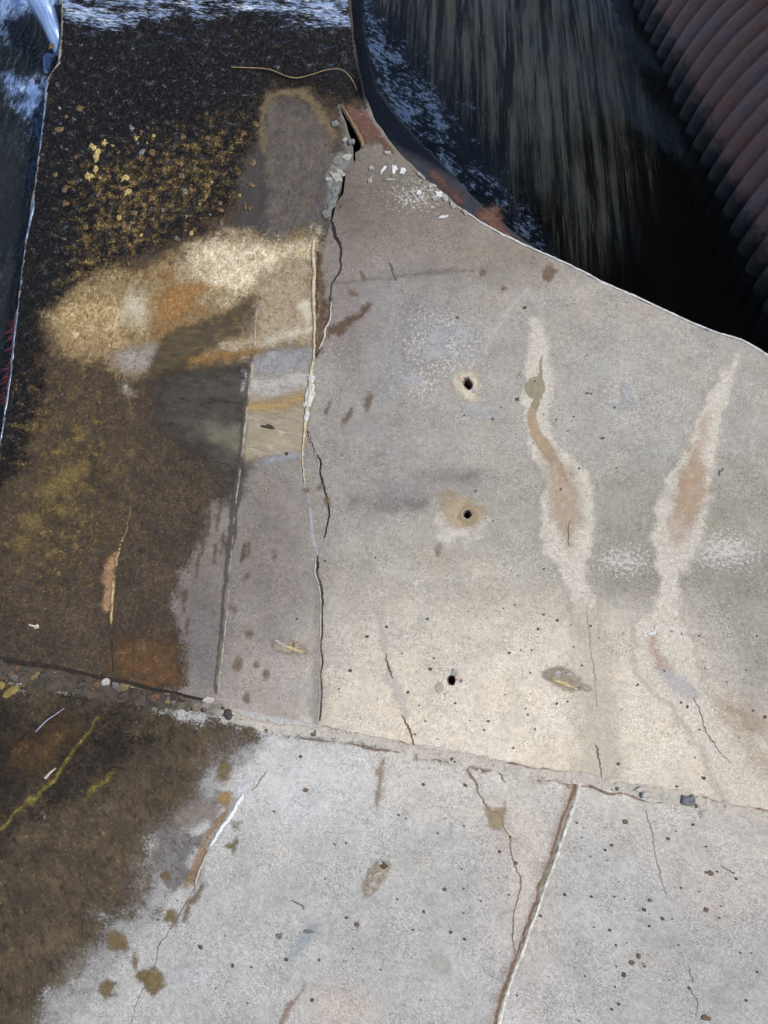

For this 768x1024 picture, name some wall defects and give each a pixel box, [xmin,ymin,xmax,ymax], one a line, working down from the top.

peeling [322,138,355,219]
crack [316,106,365,358]
water stain [0,59,367,694]
water stain [343,369,423,423]
crack [304,431,330,721]
water stain [0,679,385,1024]
crack [466,769,522,959]